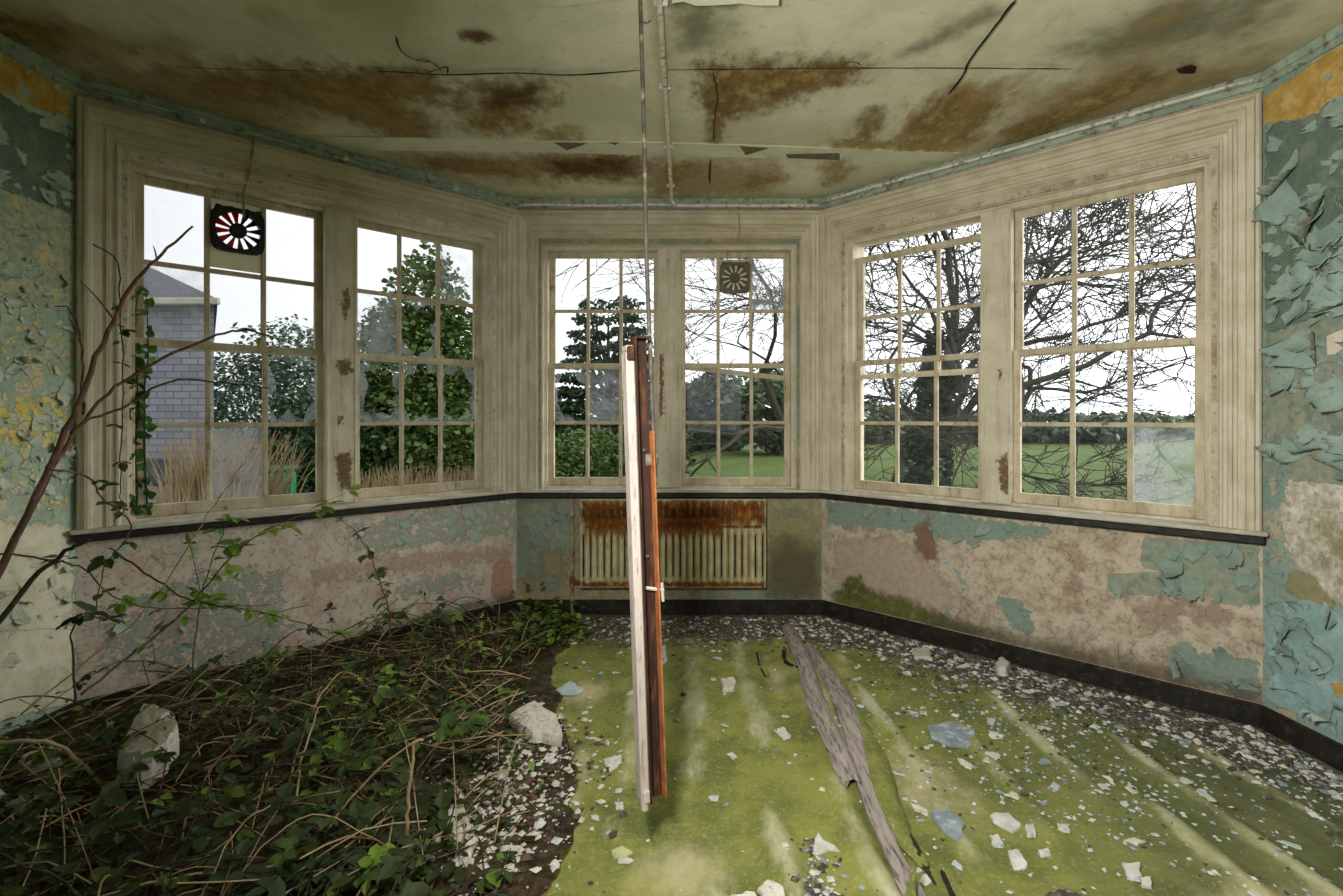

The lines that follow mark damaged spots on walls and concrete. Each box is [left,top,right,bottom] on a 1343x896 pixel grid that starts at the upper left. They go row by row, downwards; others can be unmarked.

water stain [0,6,783,195]
water stain [702,58,860,143]
crack [673,0,1061,184]
water stain [823,81,1002,186]
water stain [999,4,1251,145]
peeling [0,54,77,722]
peeling [1108,44,1343,737]
rust [581,500,628,537]
rust [657,500,766,538]